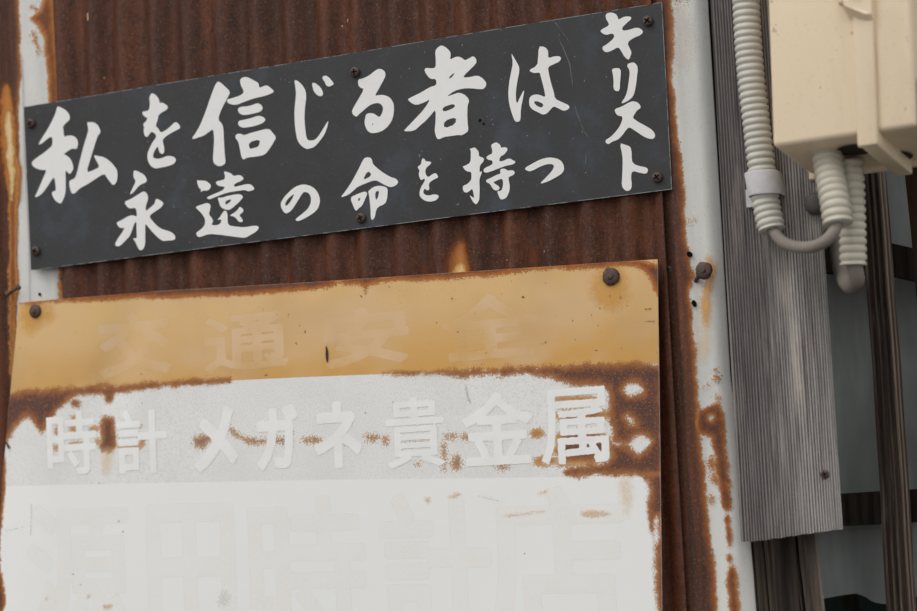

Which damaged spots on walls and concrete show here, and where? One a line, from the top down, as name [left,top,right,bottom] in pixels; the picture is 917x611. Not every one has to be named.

rust [0,0,658,540]
rust [388,360,662,611]
rust [651,0,741,611]